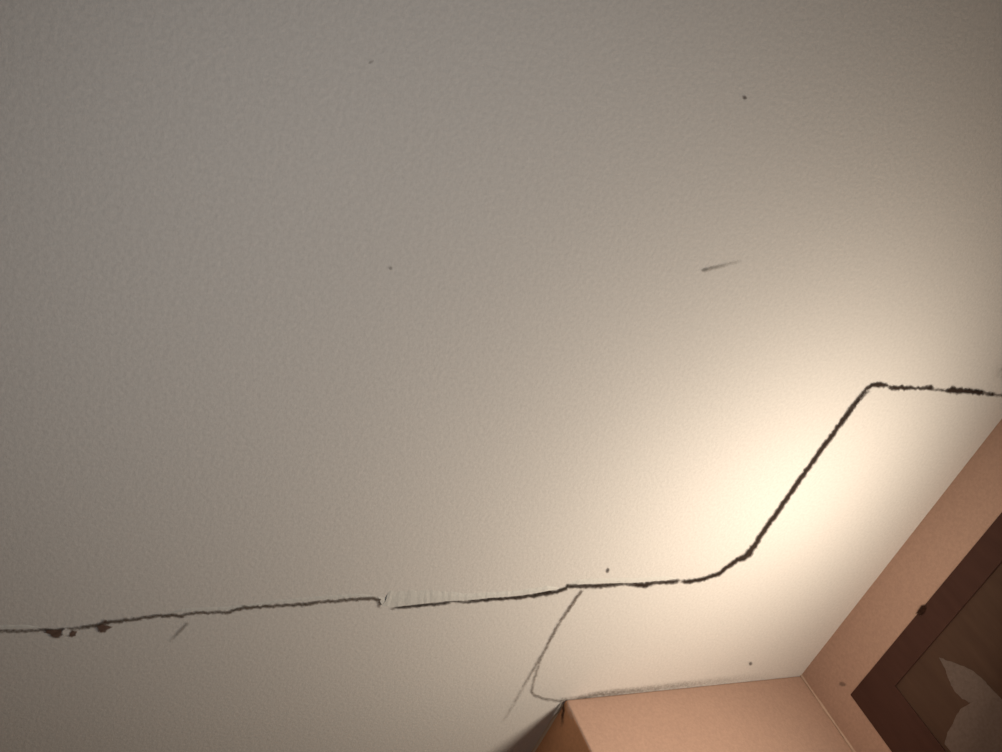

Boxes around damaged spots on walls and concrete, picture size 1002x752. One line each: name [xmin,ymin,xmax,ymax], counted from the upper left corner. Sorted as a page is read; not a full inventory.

crack [0,382,1002,718]